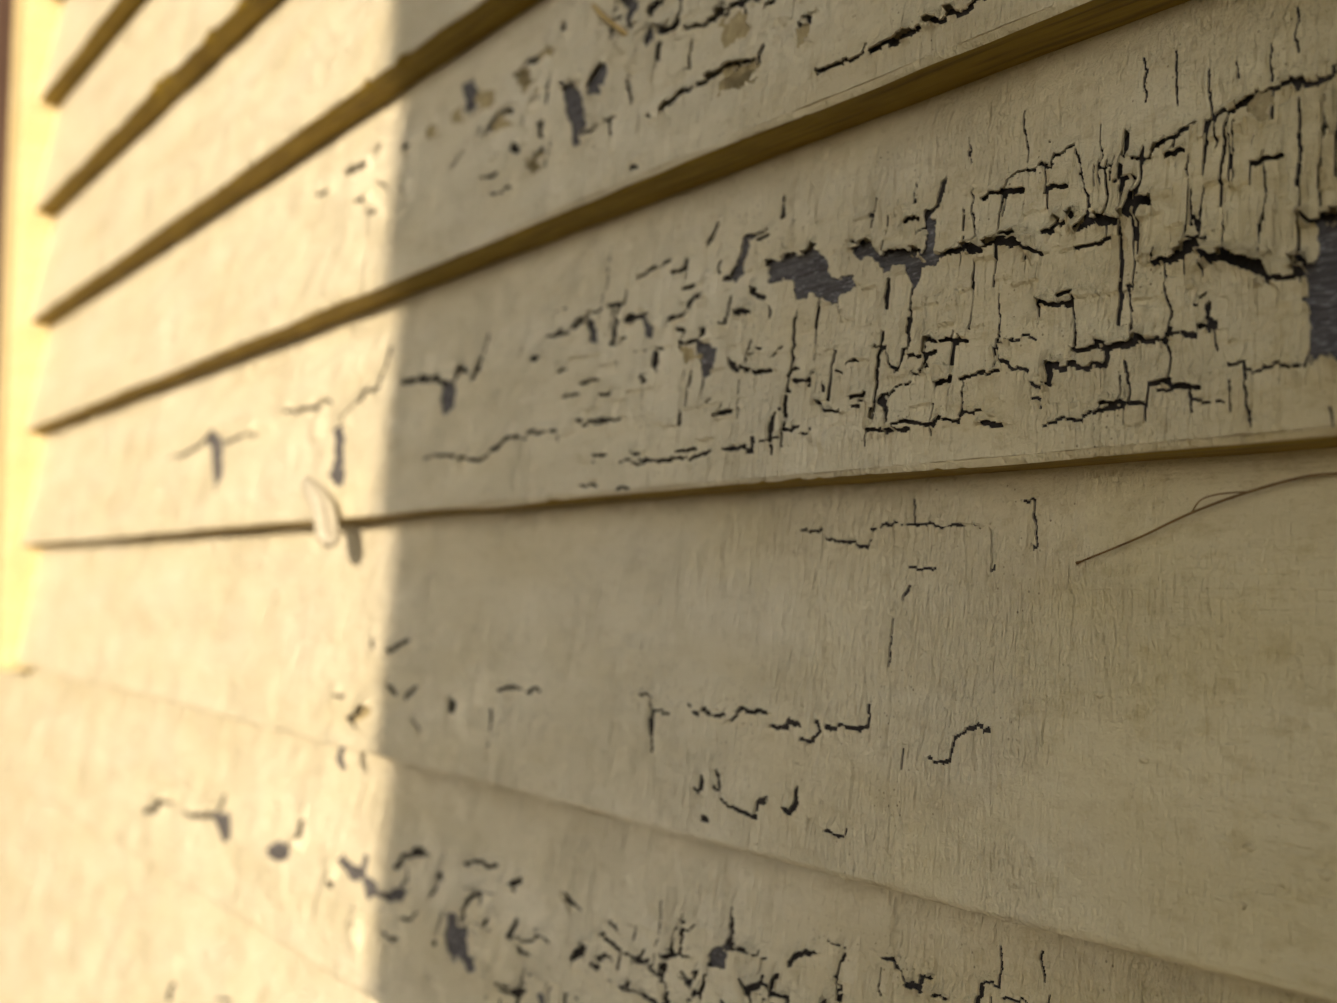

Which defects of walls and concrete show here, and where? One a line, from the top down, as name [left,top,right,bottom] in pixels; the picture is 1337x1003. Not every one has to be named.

peeling [144,0,1337,548]
peeling [122,605,1218,1003]
crack [616,471,1090,882]